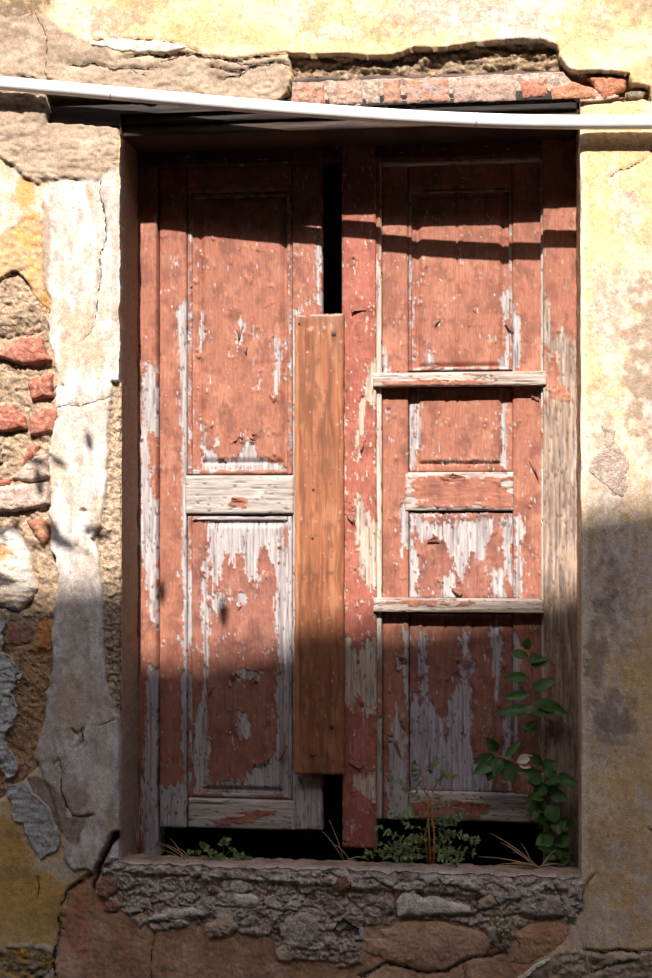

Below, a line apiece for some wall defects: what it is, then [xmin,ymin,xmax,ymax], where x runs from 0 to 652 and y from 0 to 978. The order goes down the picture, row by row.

peeling [91,39,188,55]
peeling [589,425,630,497]
spalling [0,275,91,859]
flaking render [517,957,550,978]